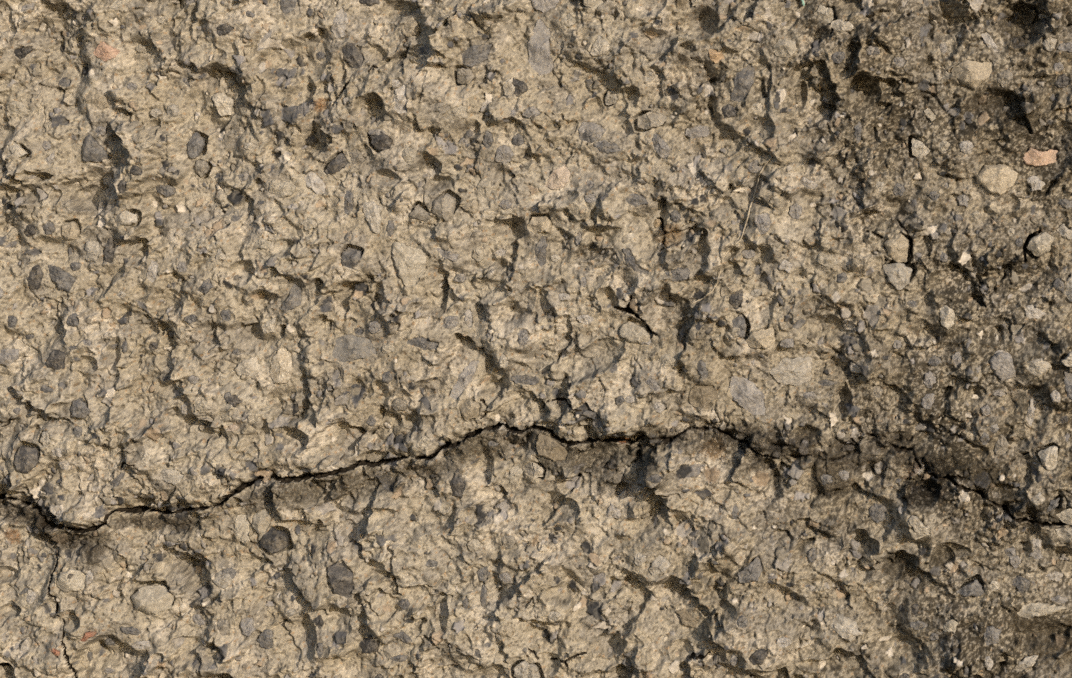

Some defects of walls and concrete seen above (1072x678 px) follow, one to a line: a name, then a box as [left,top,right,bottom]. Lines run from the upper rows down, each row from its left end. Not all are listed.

crack [614,295,657,336]
crack [0,397,1066,678]